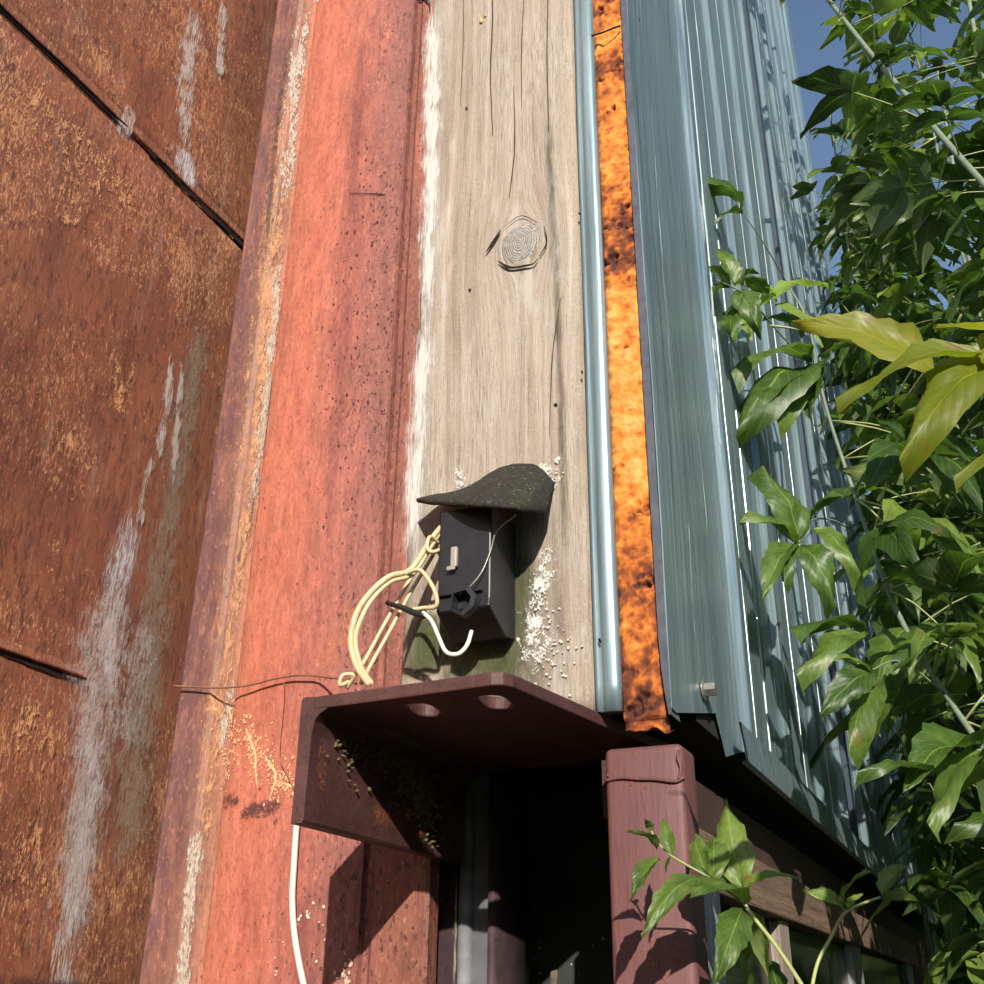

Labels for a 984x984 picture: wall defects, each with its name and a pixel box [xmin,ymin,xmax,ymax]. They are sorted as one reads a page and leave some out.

rust [15,71,143,227]
water stain [117,108,135,139]
water stain [174,2,227,188]
water stain [405,17,442,552]
rust [100,349,138,414]
rust [55,417,97,483]
water stain [51,358,184,984]
rust [3,681,77,798]
rust [0,821,68,910]
rust [223,795,280,819]